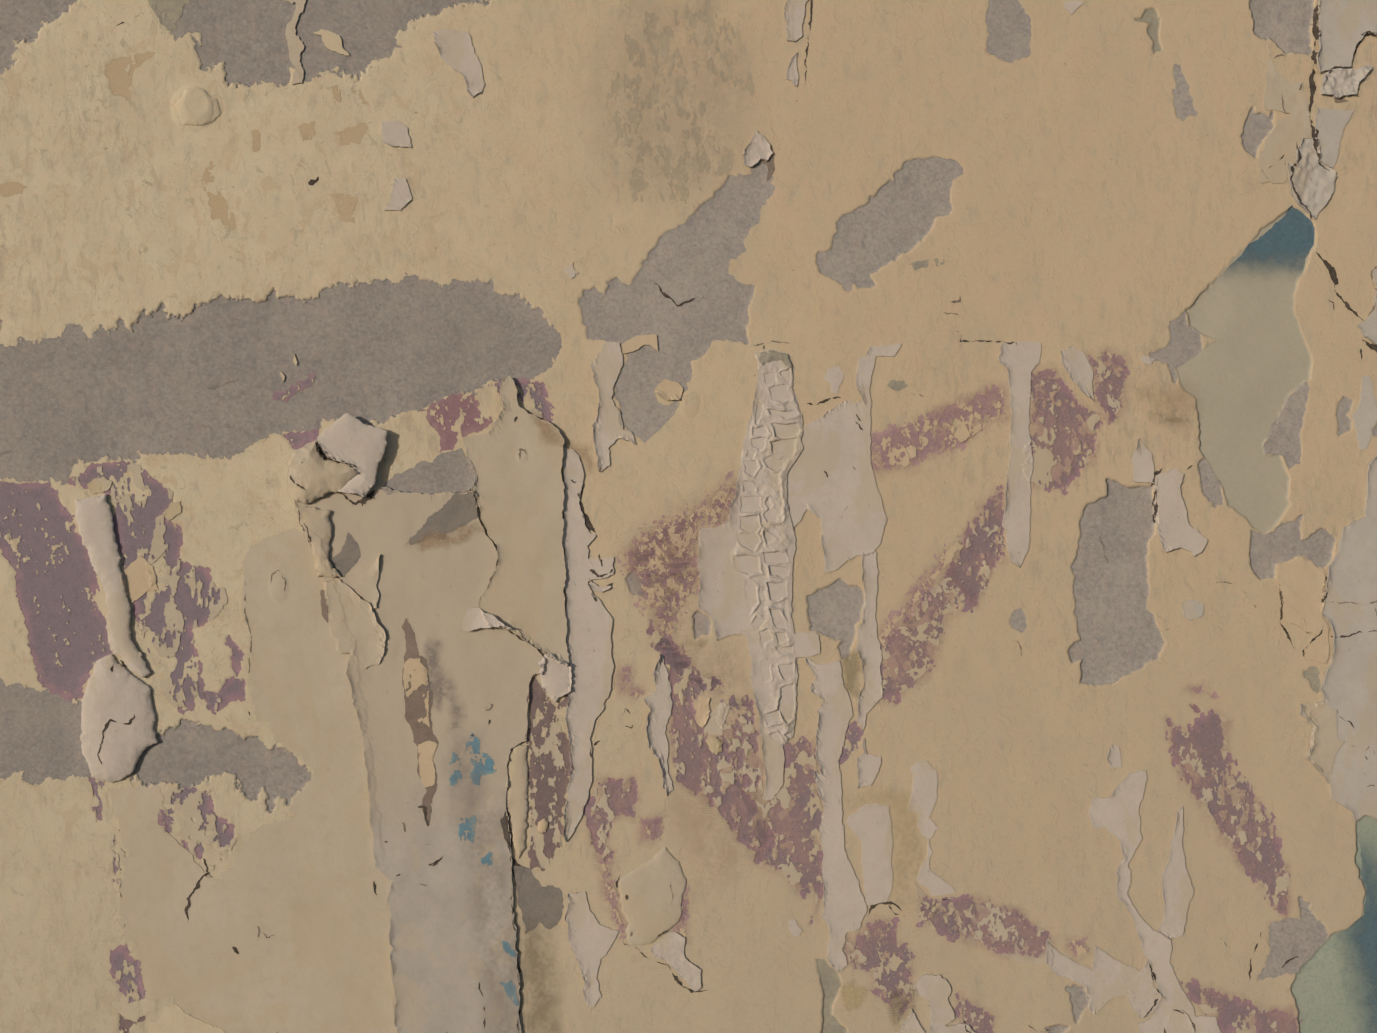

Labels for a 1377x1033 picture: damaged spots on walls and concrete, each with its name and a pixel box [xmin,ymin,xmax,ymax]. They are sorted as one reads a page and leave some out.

peeling [0,0,78,74]
peeling [166,0,490,97]
flaking render [784,0,808,87]
peeling [816,157,963,292]
peeling [0,273,562,813]
peeling [506,130,775,1007]
flaking render [998,341,1041,568]
flaking render [1060,346,1094,401]
peeling [1068,0,1377,1033]
flaking render [693,343,908,1033]
crack [185,858,215,923]
flaking render [898,744,1221,1033]